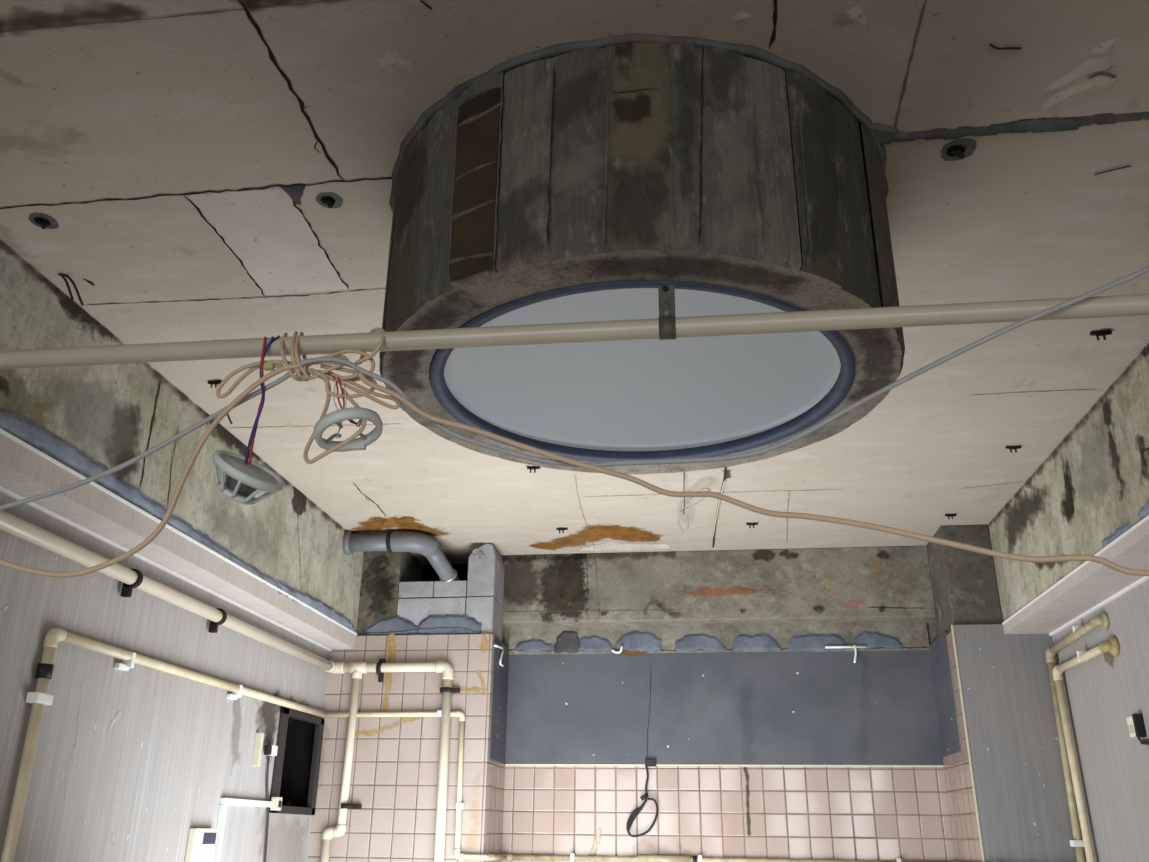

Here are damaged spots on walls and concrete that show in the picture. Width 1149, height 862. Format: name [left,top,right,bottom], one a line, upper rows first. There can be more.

crack [769,0,777,48]
crack [894,0,927,128]
crack [0,0,399,305]
peeling [989,118,1085,133]
water stain [200,407,259,458]
water stain [292,486,307,516]
rust [353,516,448,536]
rust [531,525,661,550]
water stain [1005,490,1046,550]
water stain [1061,460,1074,523]
water stain [502,541,675,622]
rust [383,634,395,711]